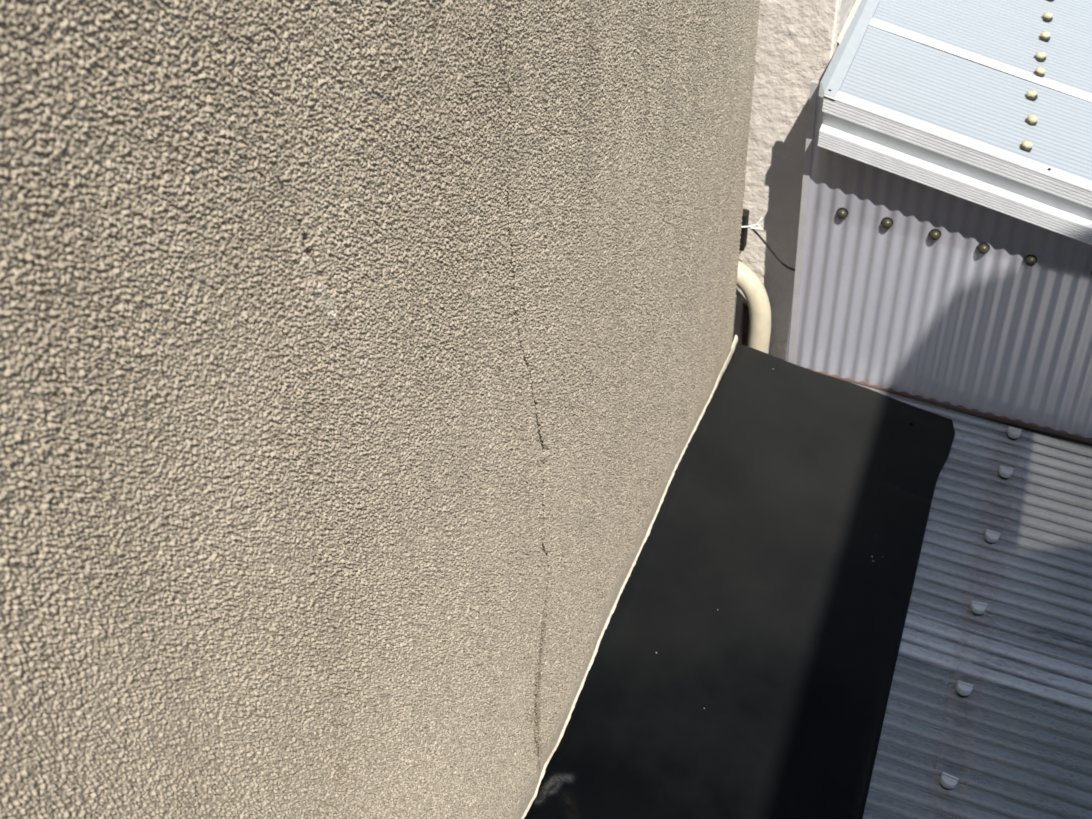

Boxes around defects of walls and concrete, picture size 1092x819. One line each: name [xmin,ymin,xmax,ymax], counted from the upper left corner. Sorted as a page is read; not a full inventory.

crack [499,5,549,769]